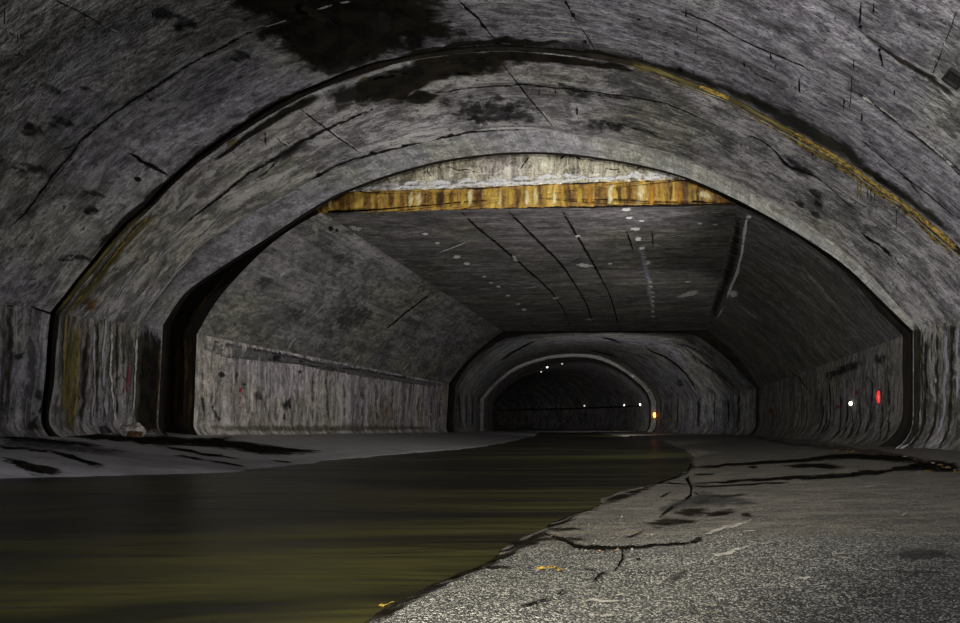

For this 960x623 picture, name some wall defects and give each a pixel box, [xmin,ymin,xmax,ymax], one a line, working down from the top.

crack [8,32,252,232]
rust [319,180,733,214]
leakage [400,35,944,227]
leakage [692,161,833,243]
rust [625,60,960,256]
crack [462,210,619,357]
crack [646,348,696,390]
crack [542,462,714,582]
crack [520,589,564,606]